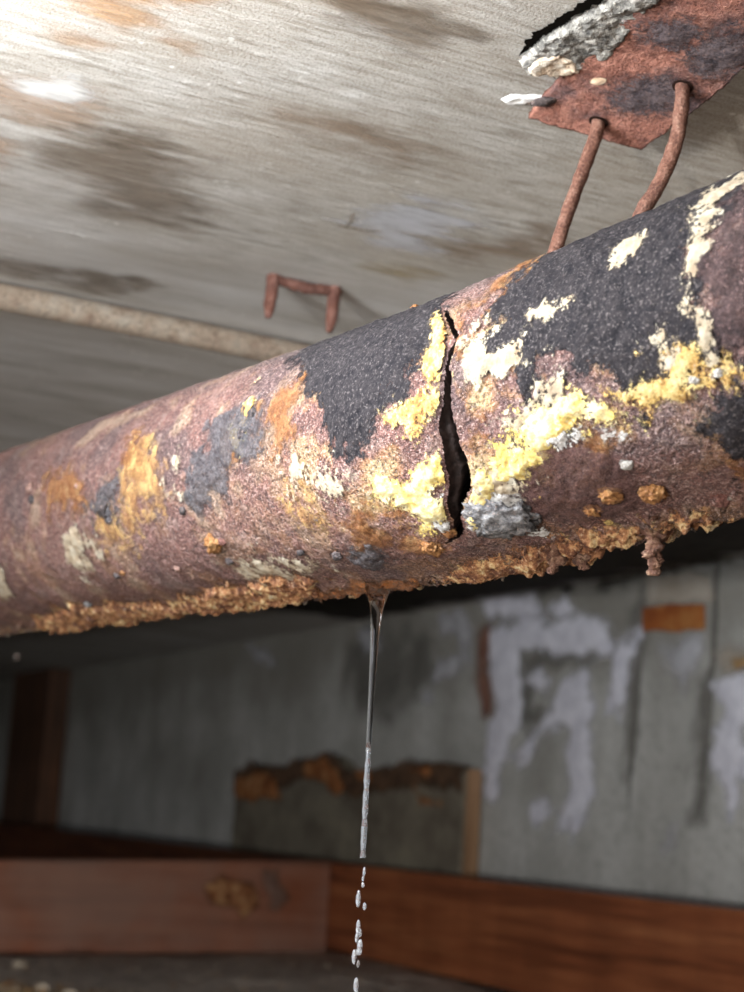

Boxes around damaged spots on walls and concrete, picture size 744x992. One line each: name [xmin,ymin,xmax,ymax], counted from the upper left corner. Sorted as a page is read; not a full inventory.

spalling [518,0,659,79]
damp [0,81,87,124]
spalling [500,94,542,105]
damp [44,126,190,226]
damp [365,197,472,250]
corrosion [448,255,543,360]
corrosion [256,371,306,462]
crack [438,310,472,544]
corrosion [41,459,88,525]
corrosion [0,490,744,637]
damp [261,518,744,836]
spalling [233,751,462,803]